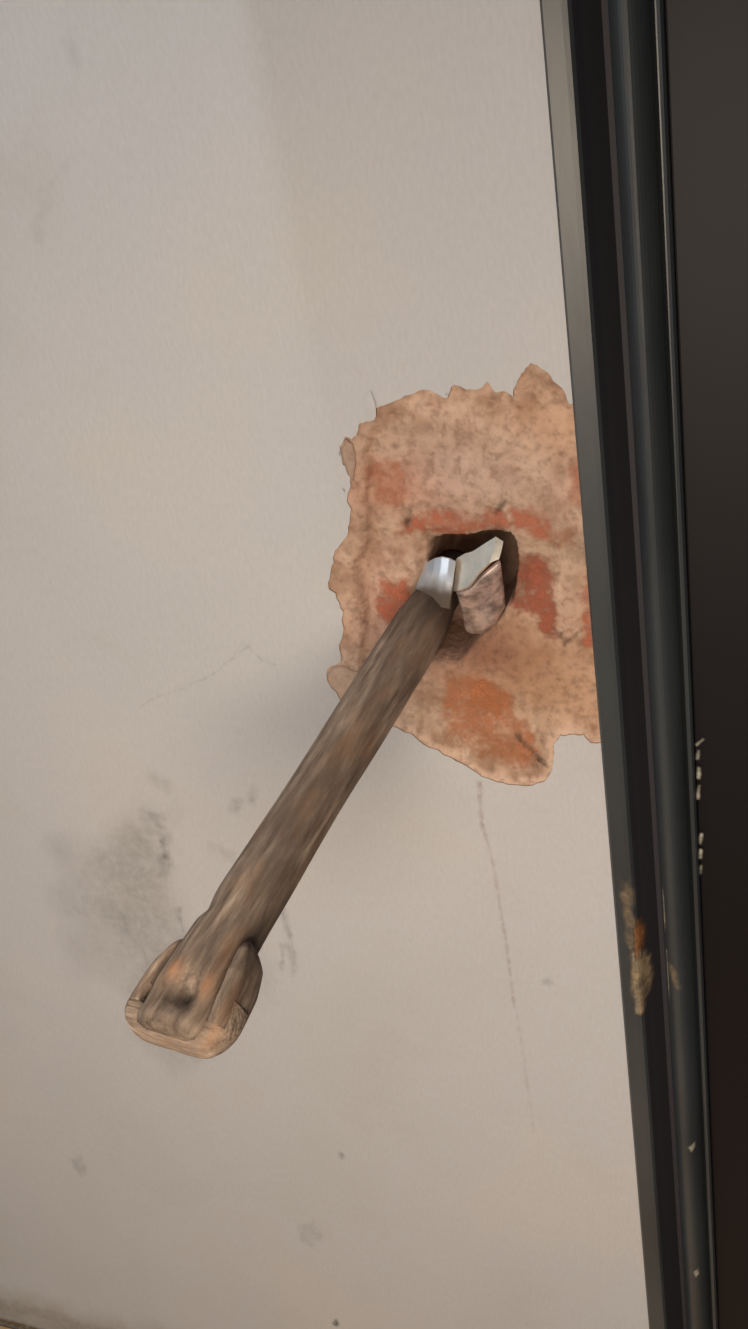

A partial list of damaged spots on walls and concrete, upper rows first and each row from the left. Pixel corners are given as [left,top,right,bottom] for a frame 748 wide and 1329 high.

spalling [326,363,601,786]